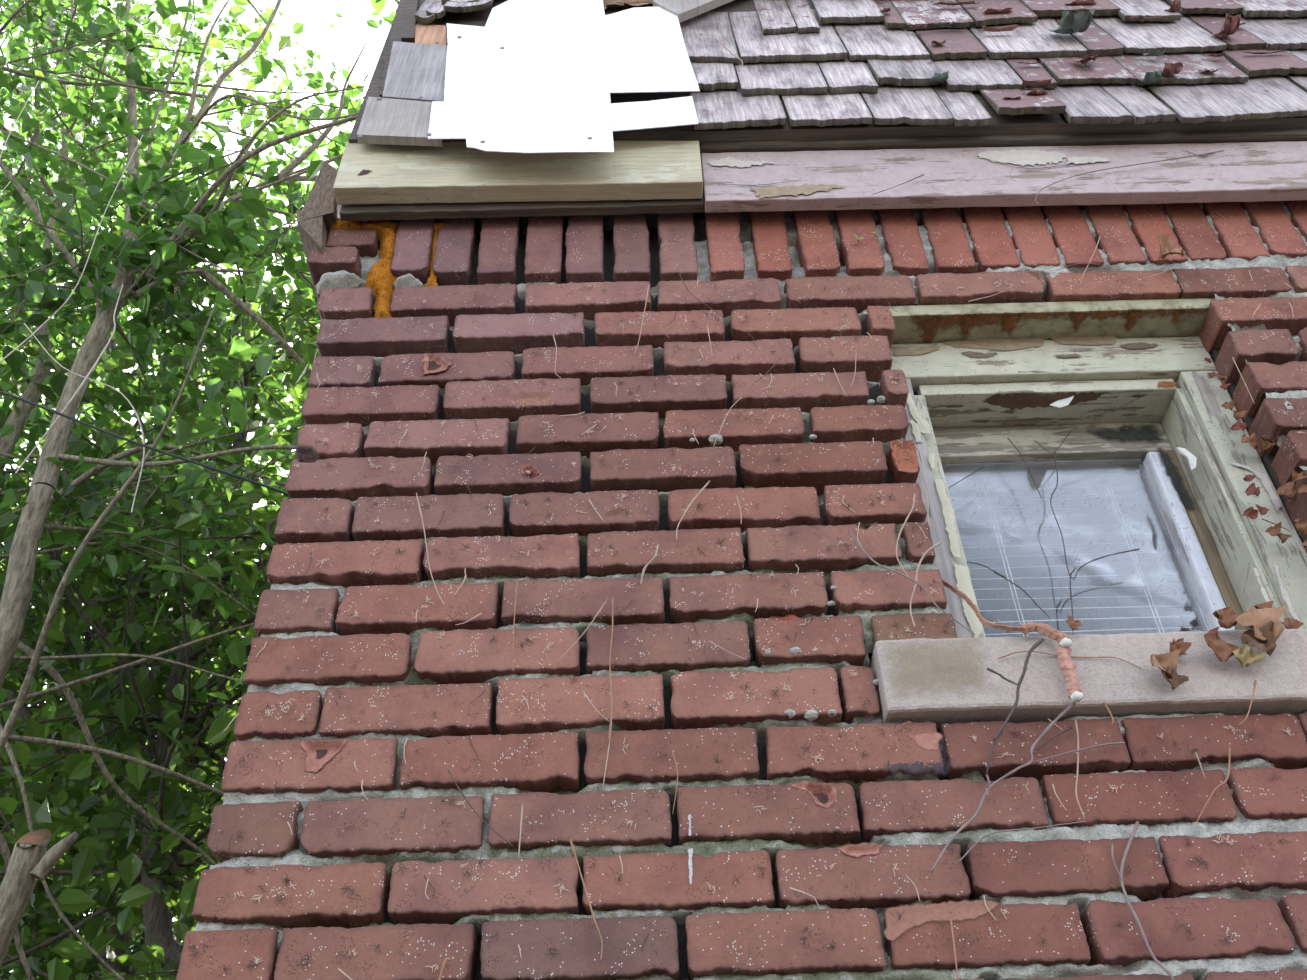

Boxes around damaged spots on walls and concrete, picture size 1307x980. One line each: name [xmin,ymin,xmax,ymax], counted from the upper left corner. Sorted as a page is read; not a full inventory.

peeling [977,149,1116,166]
corrosion [913,308,1209,343]
spalling [423,353,451,376]
peeling [946,392,1116,423]
spalling [301,739,347,772]
spalling [792,781,837,808]
spalling [884,900,998,941]